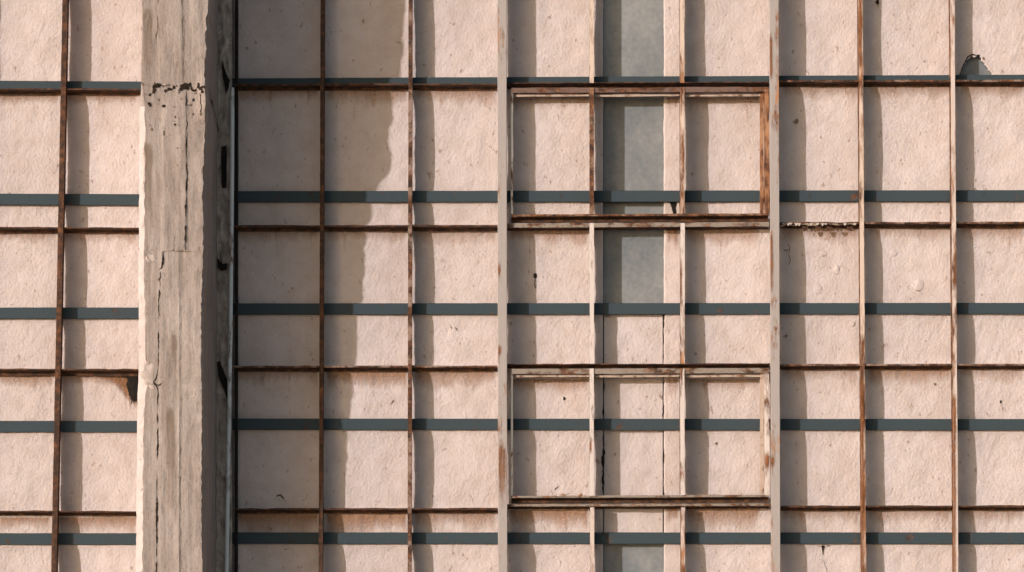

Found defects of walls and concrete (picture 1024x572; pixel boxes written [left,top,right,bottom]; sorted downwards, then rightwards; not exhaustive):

spalling [141,82,205,136]
peeling [780,223,857,232]
crack [121,0,226,572]